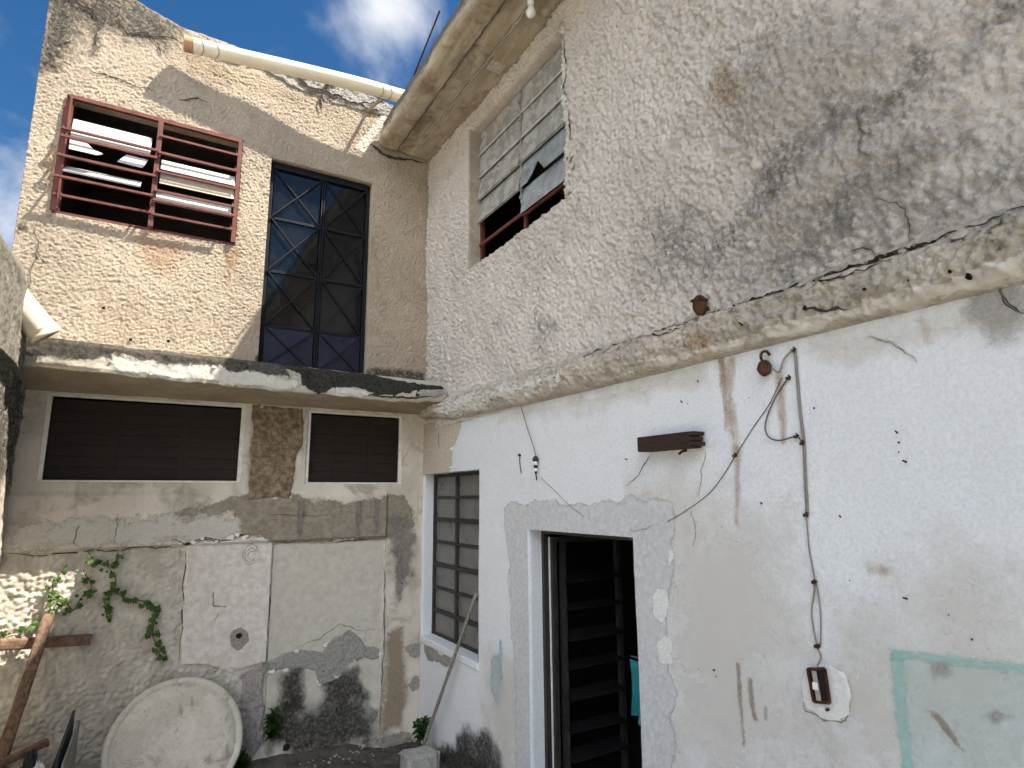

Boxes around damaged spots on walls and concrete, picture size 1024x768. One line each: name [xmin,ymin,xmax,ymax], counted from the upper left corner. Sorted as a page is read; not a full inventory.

crack [72,0,181,55]
flaking render [265,70,394,153]
crack [583,198,1024,360]
peeling [110,354,301,392]
peeling [335,387,369,398]
flaking render [10,405,417,758]
peeling [652,588,673,665]